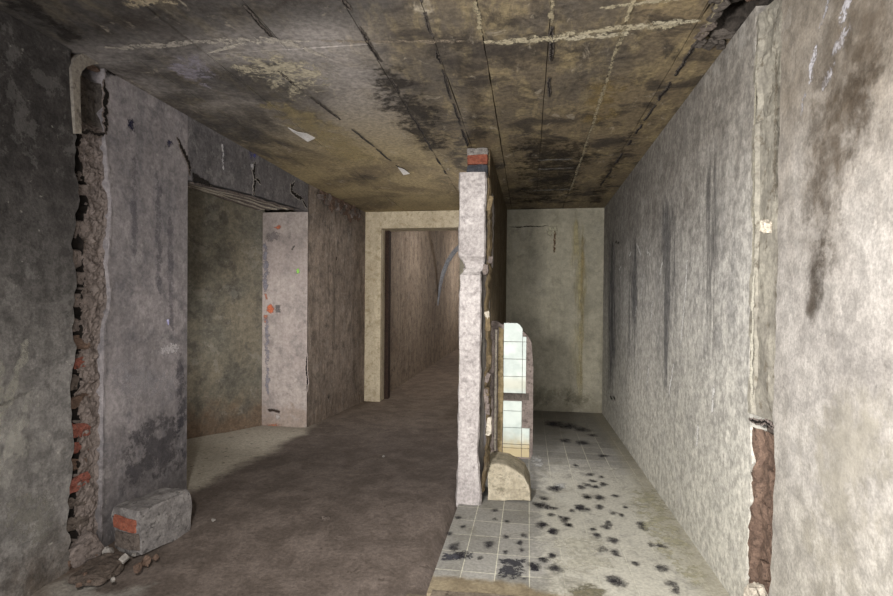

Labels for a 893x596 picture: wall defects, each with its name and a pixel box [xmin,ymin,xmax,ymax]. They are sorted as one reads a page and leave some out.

crack [242,5,273,39]
crack [278,71,400,168]
crack [341,0,447,174]
crack [420,0,469,147]
crack [546,26,555,97]
leakage [473,0,723,191]
crack [600,40,699,186]
spalling [693,0,774,50]
leakage [809,26,850,90]
crack [290,180,308,209]
spalling [66,76,113,544]
spalling [747,427,776,595]